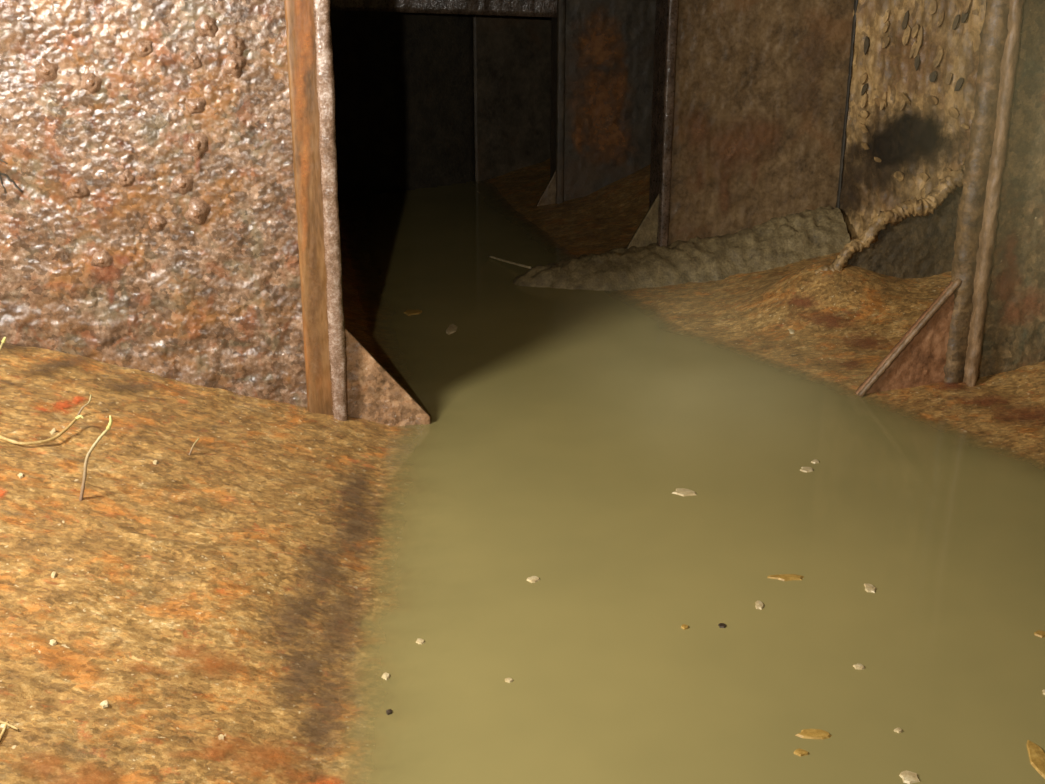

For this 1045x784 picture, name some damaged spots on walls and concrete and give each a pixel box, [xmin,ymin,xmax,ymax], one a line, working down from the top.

corrosion [135,40,153,58]
corrosion [195,14,246,78]
corrosion [35,58,59,81]
corrosion [81,73,102,94]
corrosion [185,97,206,114]
corrosion [118,169,135,187]
corrosion [170,132,211,225]
corrosion [67,180,90,207]